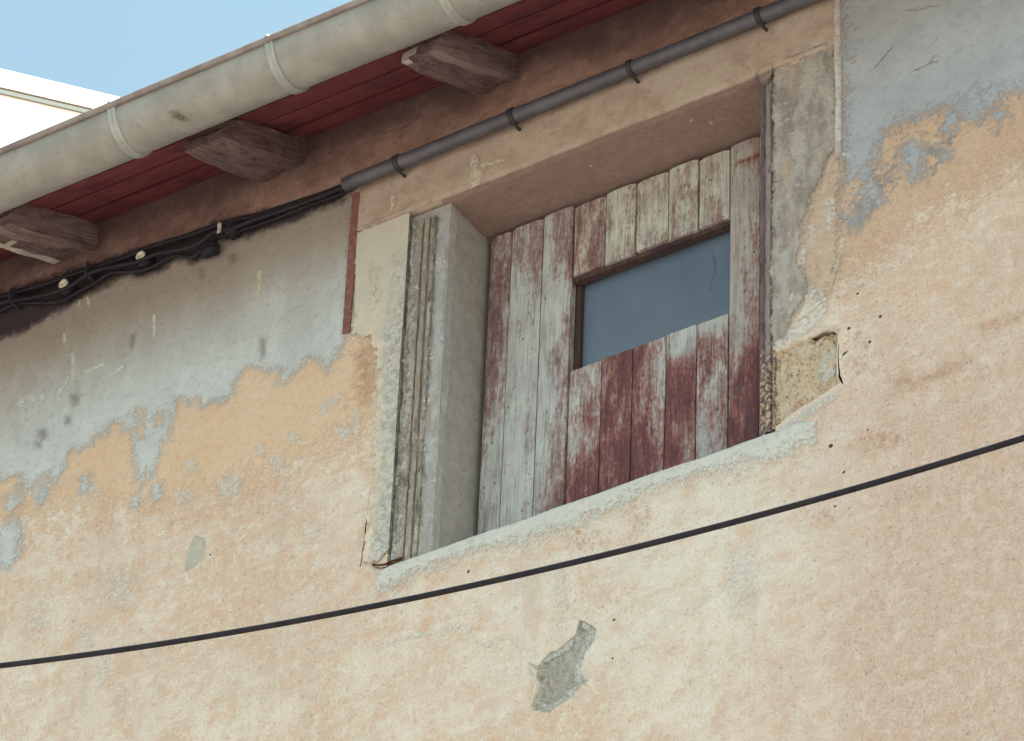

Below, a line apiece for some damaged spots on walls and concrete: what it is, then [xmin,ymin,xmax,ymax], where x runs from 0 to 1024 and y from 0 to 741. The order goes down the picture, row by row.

peeling [0,188,381,574]
peeling [772,0,1024,430]
spalling [528,619,597,713]